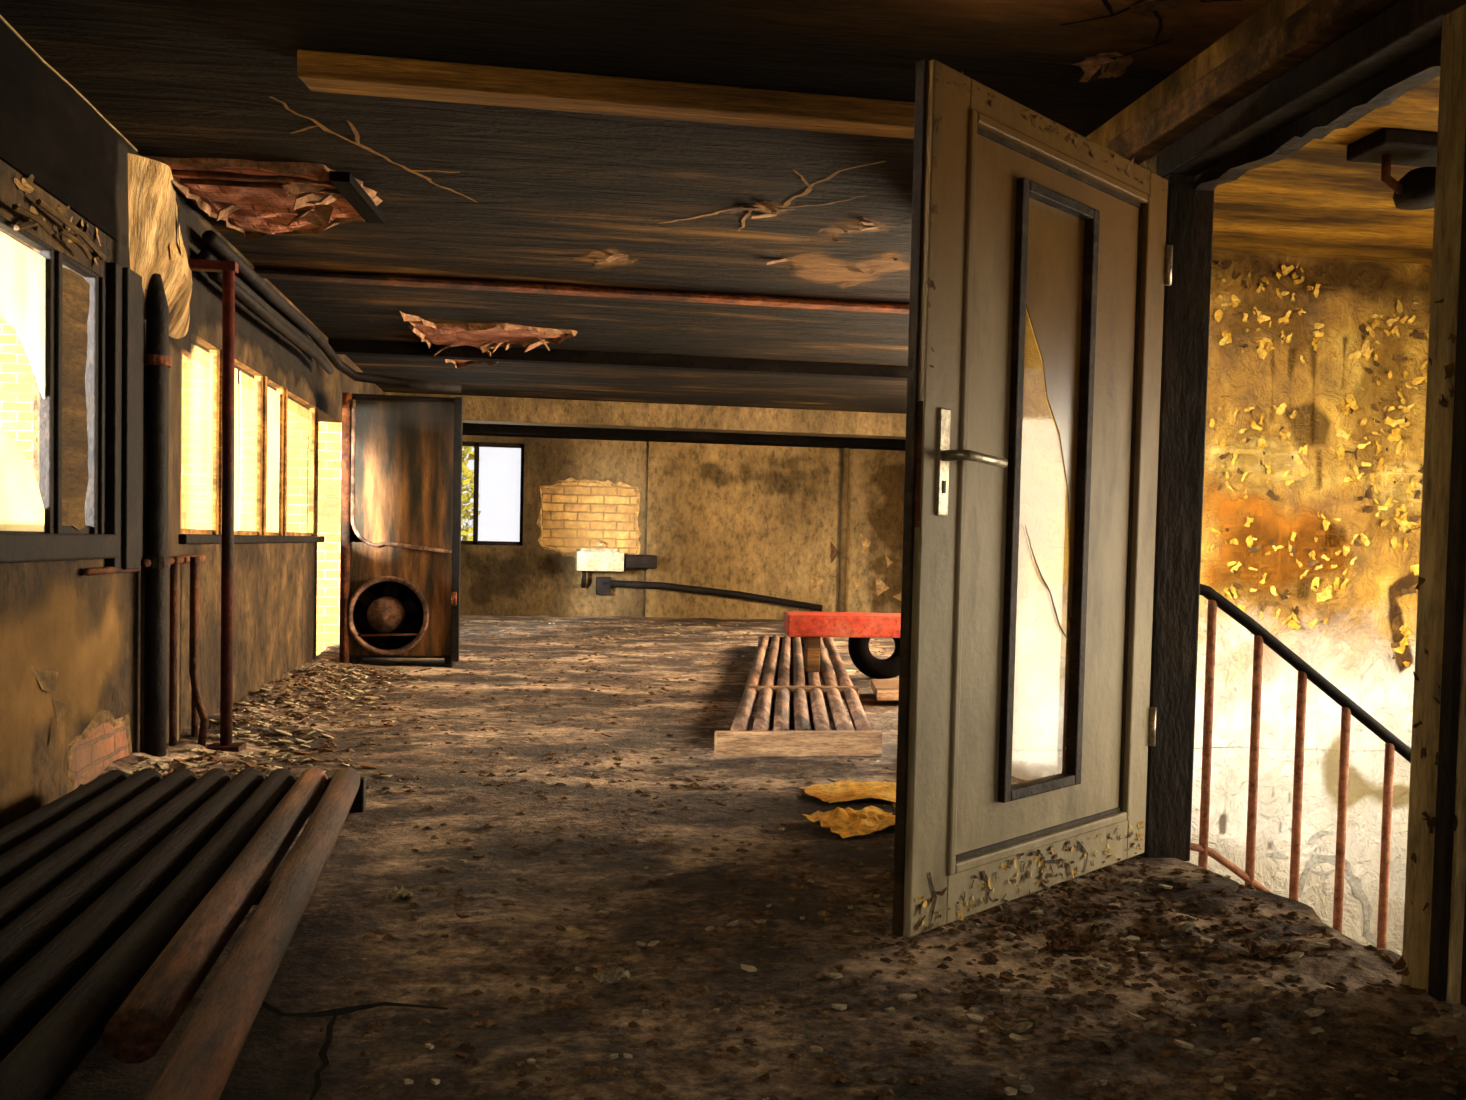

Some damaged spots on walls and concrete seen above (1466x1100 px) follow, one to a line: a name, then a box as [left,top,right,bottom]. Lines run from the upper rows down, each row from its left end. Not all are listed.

crack [270,96,477,202]
spalling [142,156,385,239]
peeling [729,201,796,219]
crack [663,161,886,232]
peeling [577,250,639,266]
peeling [767,219,908,289]
spalling [400,311,578,368]
spalling [536,478,641,558]